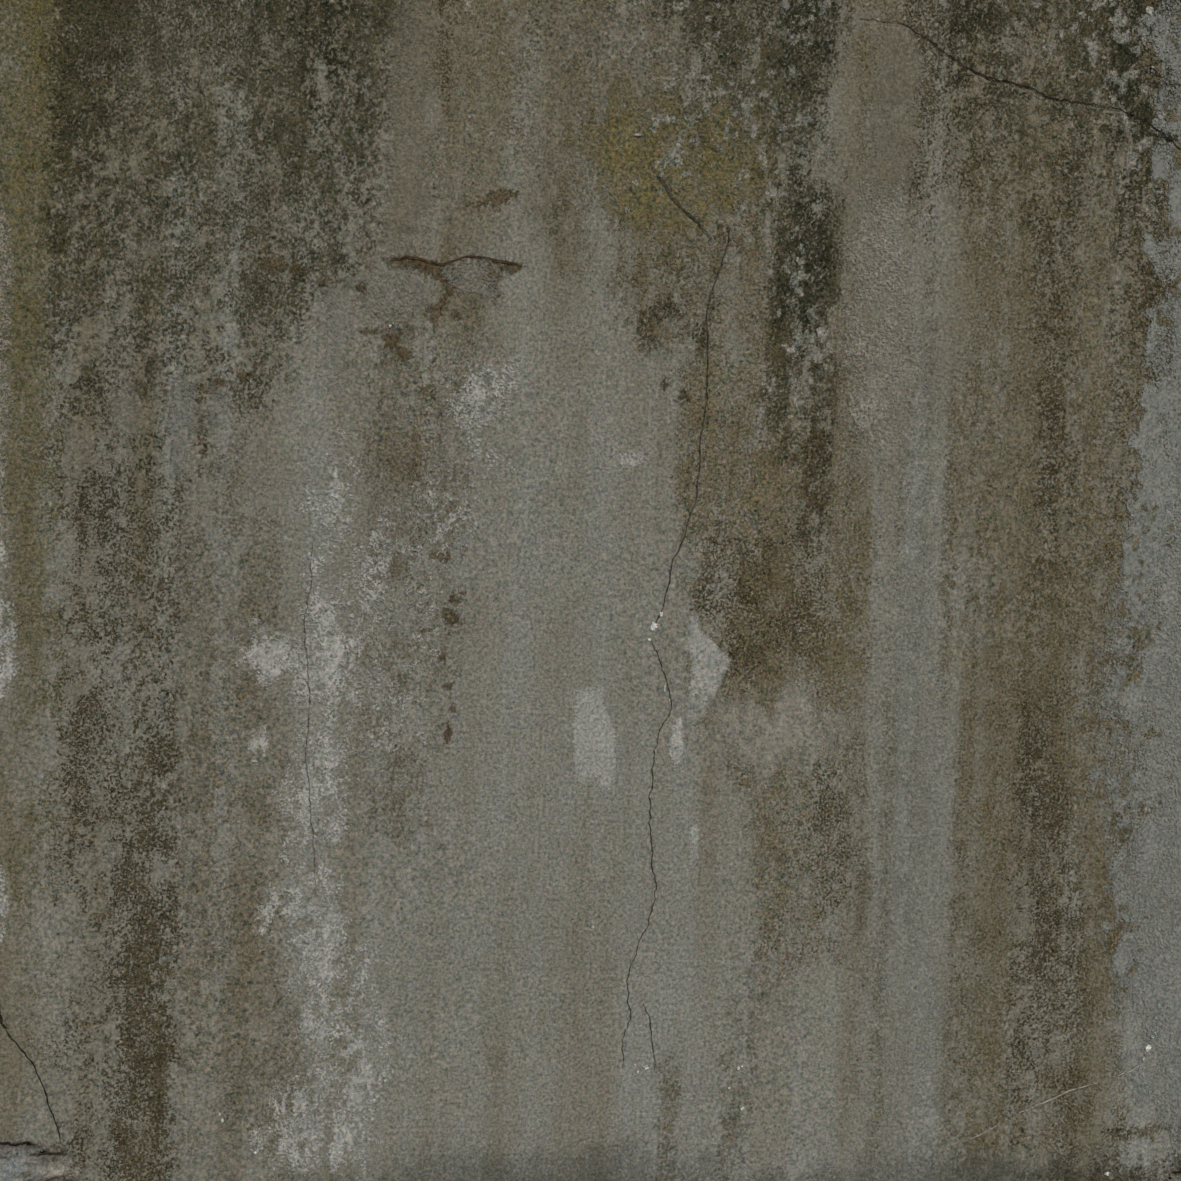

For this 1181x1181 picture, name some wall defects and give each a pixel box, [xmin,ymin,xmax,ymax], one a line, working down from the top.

crack [859,18,1181,150]
corrosion [466,188,522,212]
corrosion [360,325,411,362]
corrosion [382,251,526,328]
damp [0,0,520,1181]
damp [416,0,910,1181]
crack [621,175,730,1067]
damp [835,0,1181,1181]
crack [0,1012,63,1149]
spalling [0,1130,101,1181]